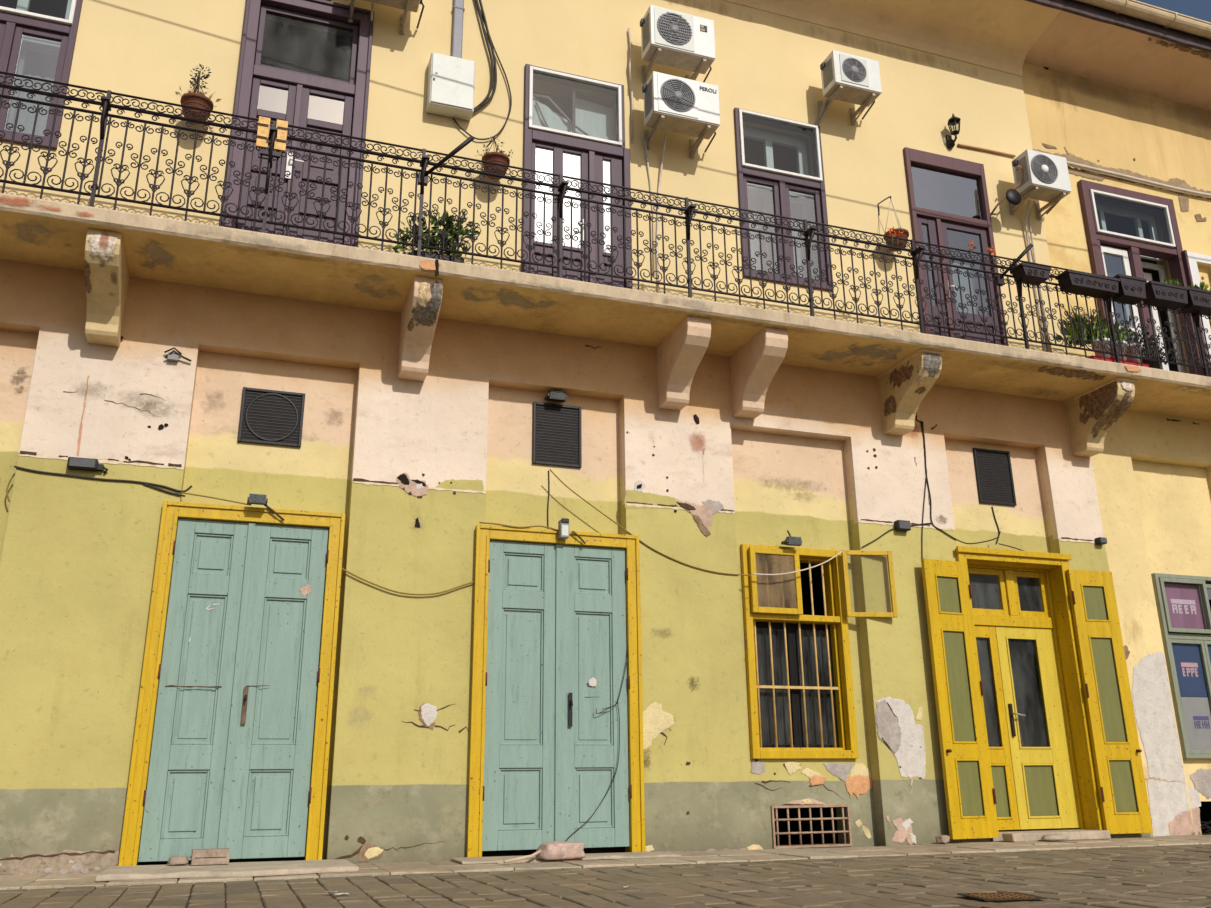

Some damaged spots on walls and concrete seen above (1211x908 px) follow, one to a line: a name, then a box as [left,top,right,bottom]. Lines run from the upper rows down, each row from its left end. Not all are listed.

peeling [407,259,443,331]
peeling [884,353,942,416]
spalling [1079,381,1134,438]
peeling [402,703,469,733]
peeling [643,702,674,750]
peeling [876,696,926,794]
peeling [1124,645,1211,837]
peeling [751,759,872,806]
flaking render [0,849,120,875]
flaking render [336,835,443,862]